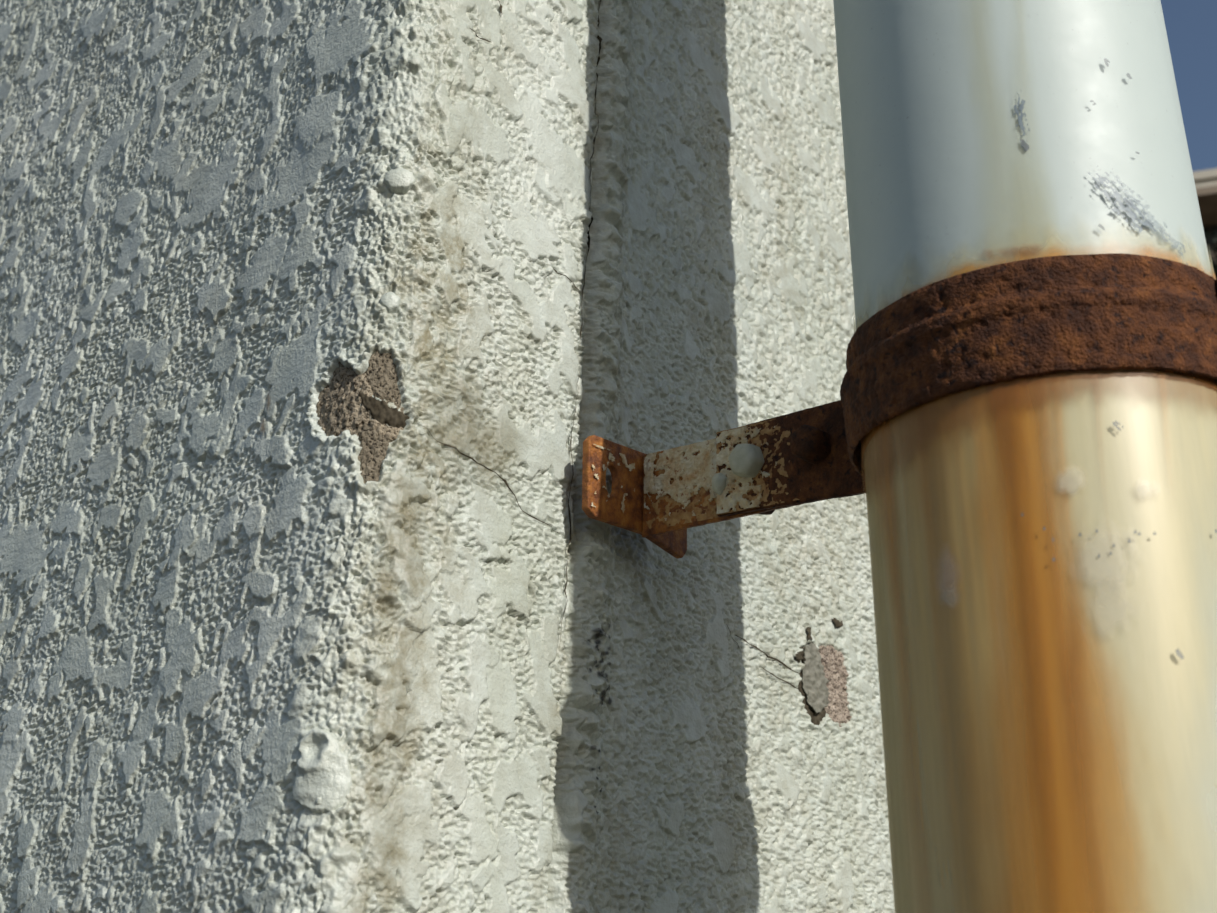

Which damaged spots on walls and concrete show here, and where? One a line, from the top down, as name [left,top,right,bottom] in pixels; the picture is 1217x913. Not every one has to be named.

crack [554,0,602,344]
corrosion [951,260,983,277]
corrosion [1045,240,1062,257]
corrosion [1170,250,1215,279]
flaking render [316,350,409,484]
crack [414,376,580,648]
flaking render [795,627,852,727]
corrosion [861,369,1217,913]